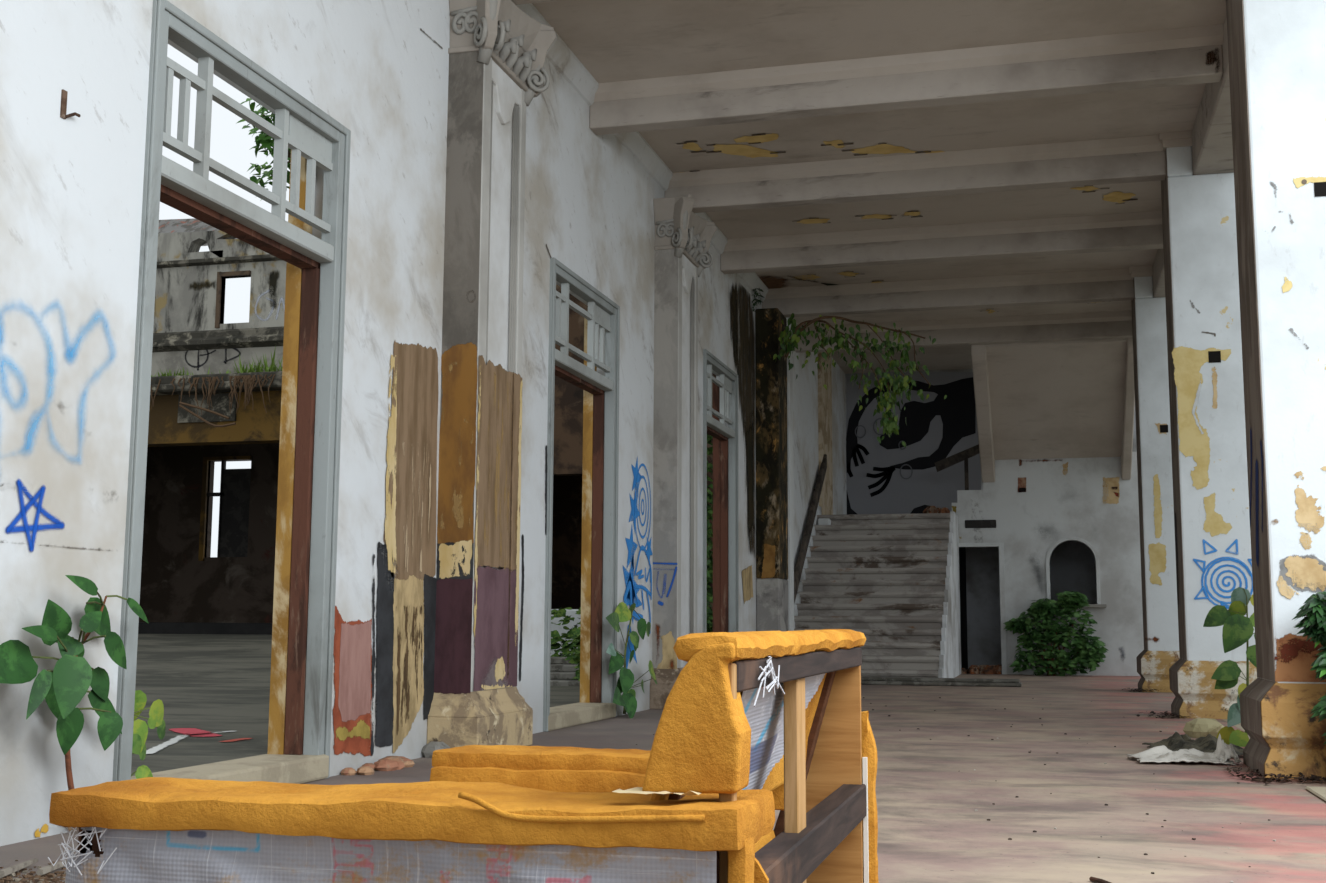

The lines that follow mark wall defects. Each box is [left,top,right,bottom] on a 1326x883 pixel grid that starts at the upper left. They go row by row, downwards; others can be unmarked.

peeling [677,133,786,158]
peeling [821,140,944,156]
peeling [1293,176,1326,197]
peeling [1155,346,1232,537]
peeling [1148,474,1166,586]
peeling [1276,471,1326,599]